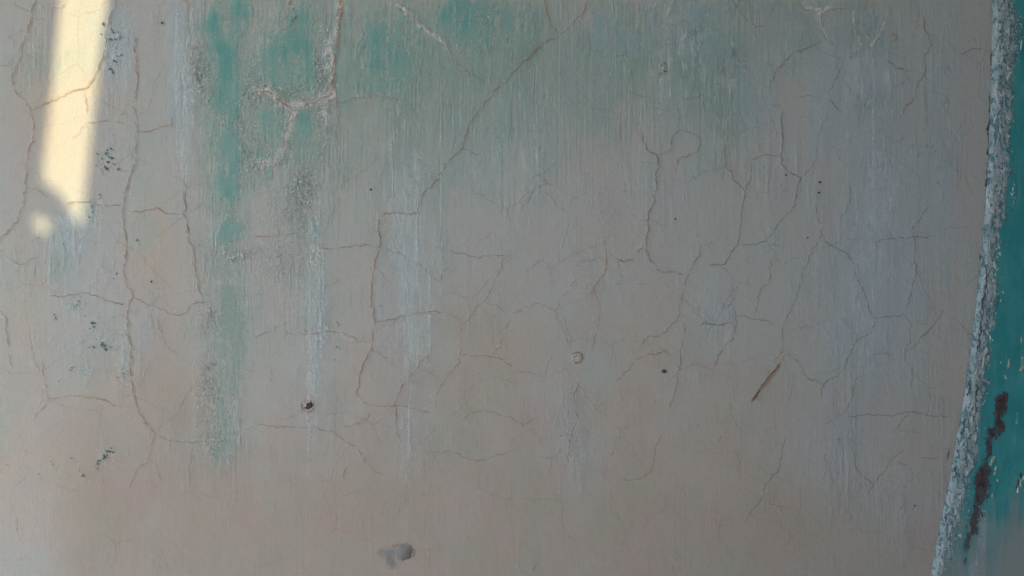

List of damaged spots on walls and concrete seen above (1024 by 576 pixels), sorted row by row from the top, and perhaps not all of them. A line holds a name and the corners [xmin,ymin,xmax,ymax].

crack [0,0,207,485]
crack [249,0,586,476]
crack [574,2,987,487]
peeling [930,0,1024,576]